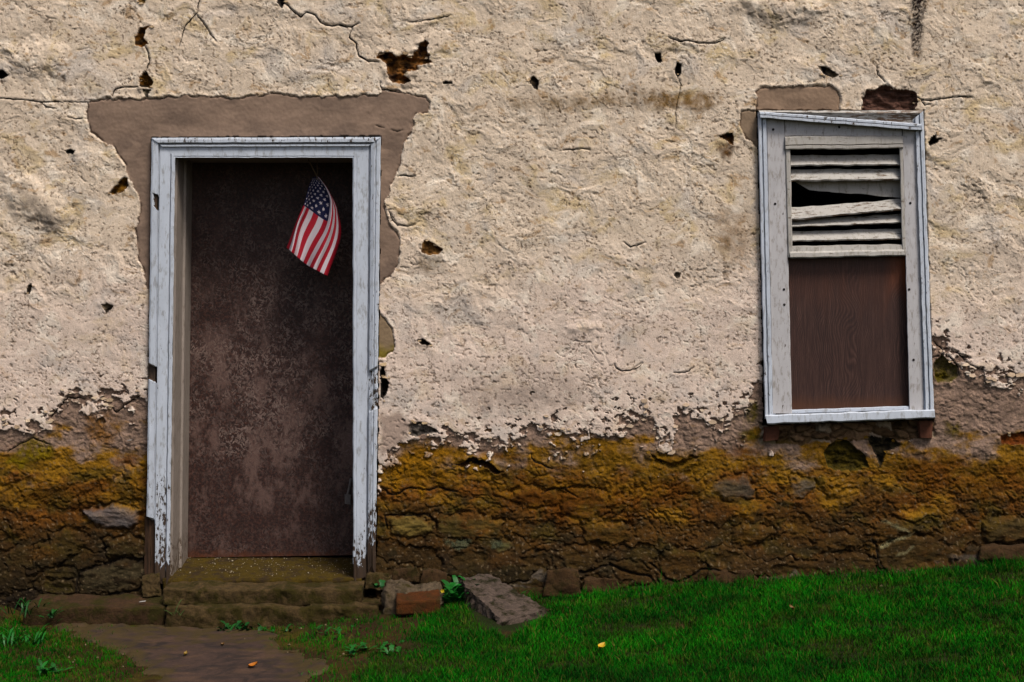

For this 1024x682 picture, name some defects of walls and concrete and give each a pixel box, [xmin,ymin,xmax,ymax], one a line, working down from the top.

crack [179,0,215,45]
crack [286,4,399,93]
spalling [377,40,433,85]
spalling [861,85,920,111]
spalling [108,177,129,195]
spalling [376,319,1024,592]
spalling [0,375,148,612]